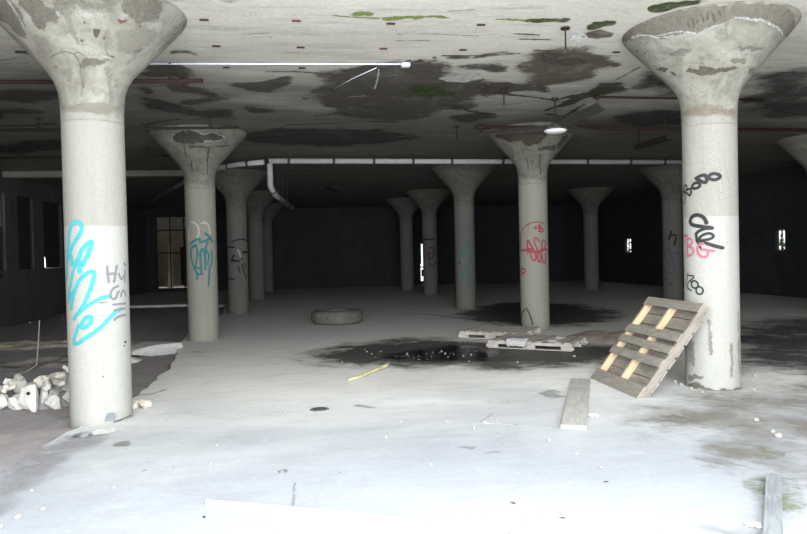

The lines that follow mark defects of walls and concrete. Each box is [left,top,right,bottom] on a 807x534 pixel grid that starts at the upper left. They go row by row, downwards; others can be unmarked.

peeling [0,0,60,38]
peeling [119,0,163,23]
peeling [622,1,795,42]
spalling [81,54,113,69]
leakage [140,65,237,126]
leakage [232,33,620,147]
spalling [686,66,737,76]
leakage [731,58,807,118]
peeling [171,129,228,174]
leakage [312,338,612,370]